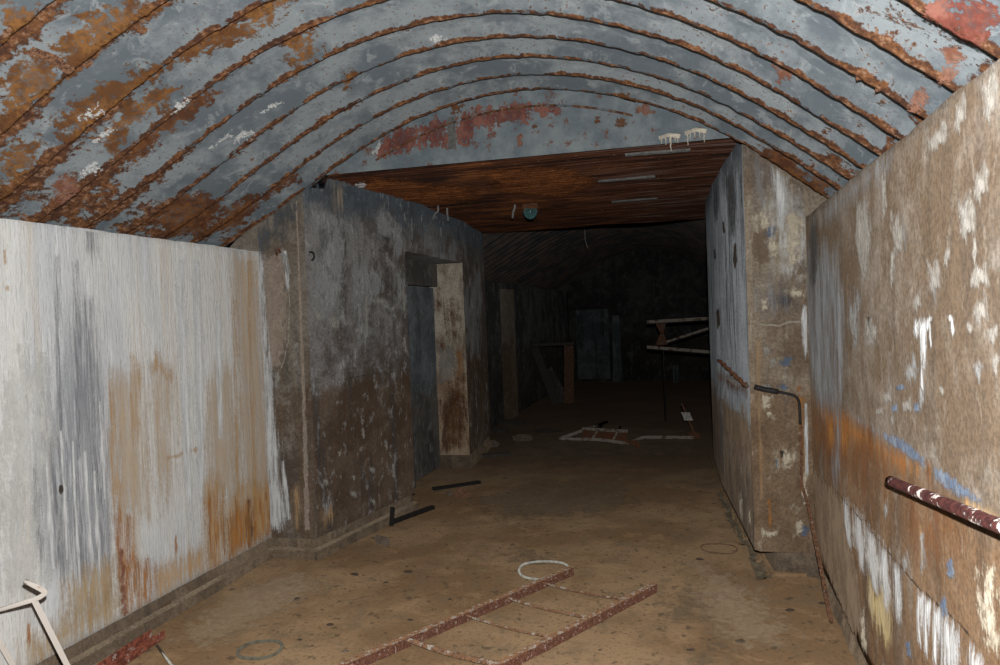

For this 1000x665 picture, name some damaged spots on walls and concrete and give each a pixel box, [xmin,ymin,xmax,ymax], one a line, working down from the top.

rust [0,0,298,200]
rust [275,28,326,73]
rust [342,70,358,91]
rust [606,93,655,115]
rust [907,87,930,114]
rust [912,0,1000,85]
rust [145,170,303,240]
rust [440,353,467,450]
water stain [0,303,104,592]
rust [28,259,271,663]